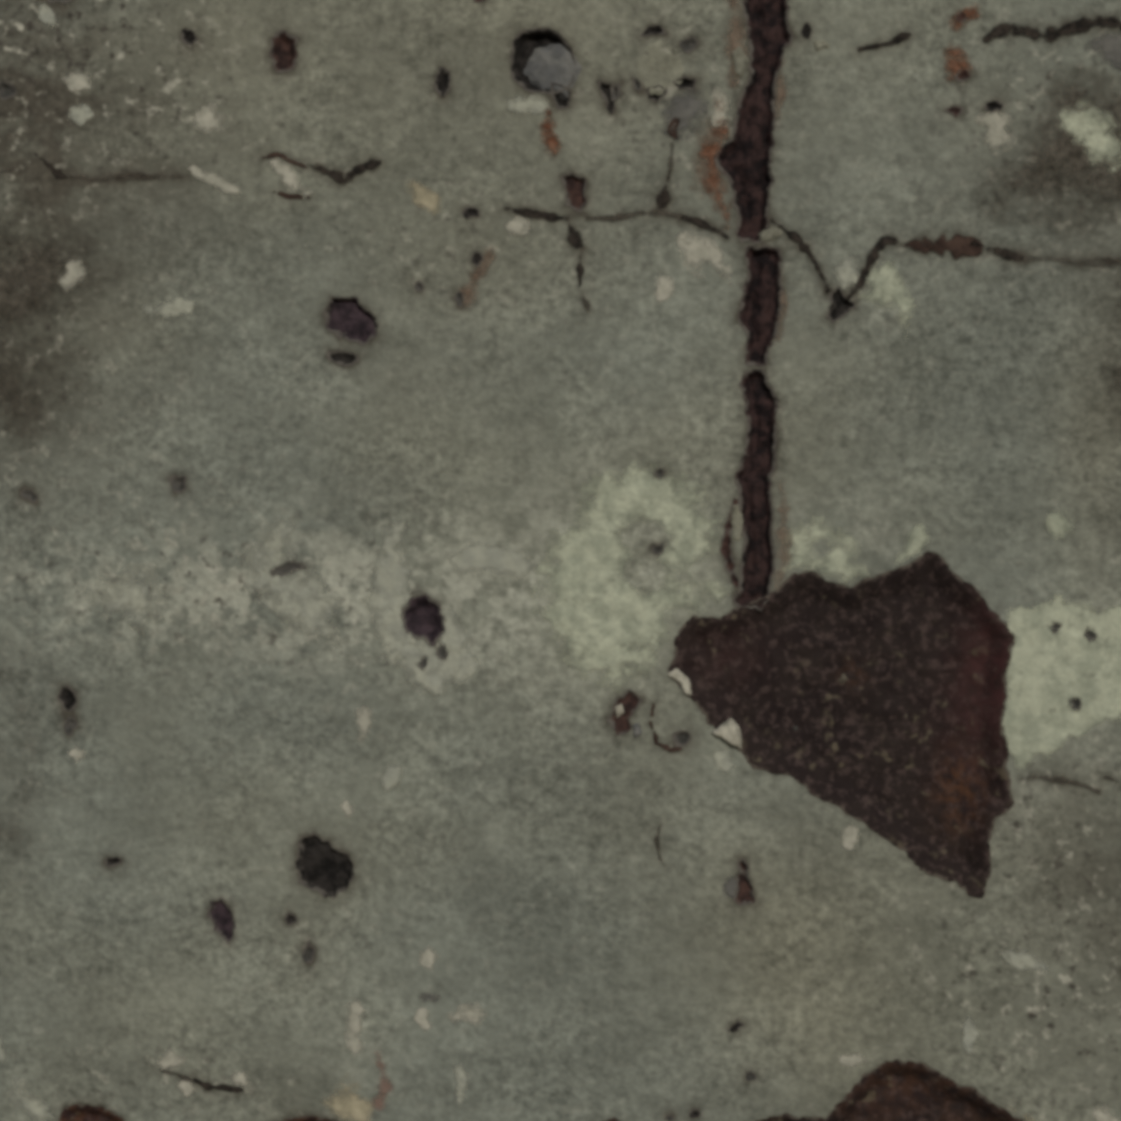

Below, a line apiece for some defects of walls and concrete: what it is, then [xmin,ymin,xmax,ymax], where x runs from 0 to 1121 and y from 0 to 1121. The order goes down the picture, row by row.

crack [983,15,1121,42]
crack [1,153,181,181]
crack [262,152,382,199]
spalling [323,296,378,367]
crack [504,0,1024,611]
spalling [401,594,448,671]
spalling [667,551,1015,906]
spalling [295,832,355,899]
spalling [58,1104,123,1121]
spalling [756,1059,1023,1121]